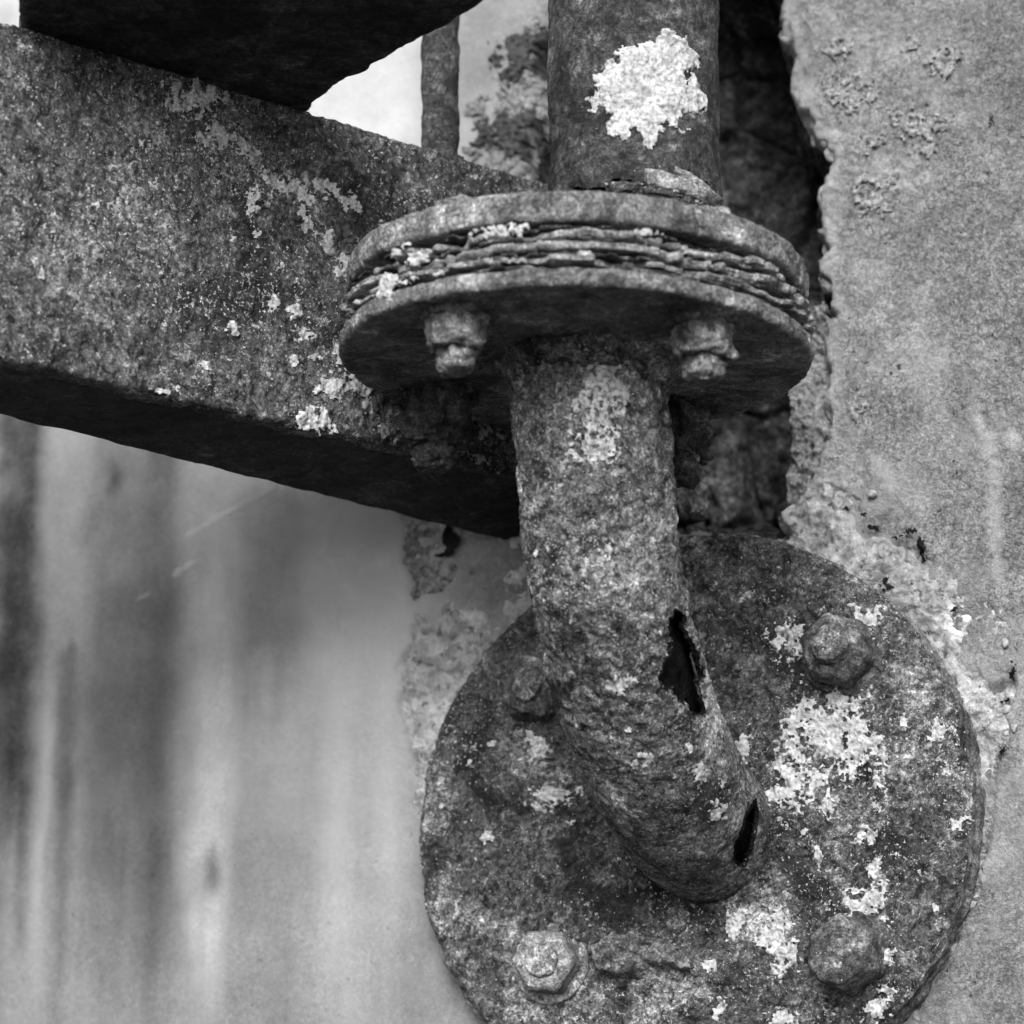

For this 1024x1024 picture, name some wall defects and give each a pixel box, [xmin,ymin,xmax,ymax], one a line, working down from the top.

corrosion [604,166,725,207]
spalling [677,0,1018,788]
leakage [0,415,39,825]
spalling [963,815,994,924]